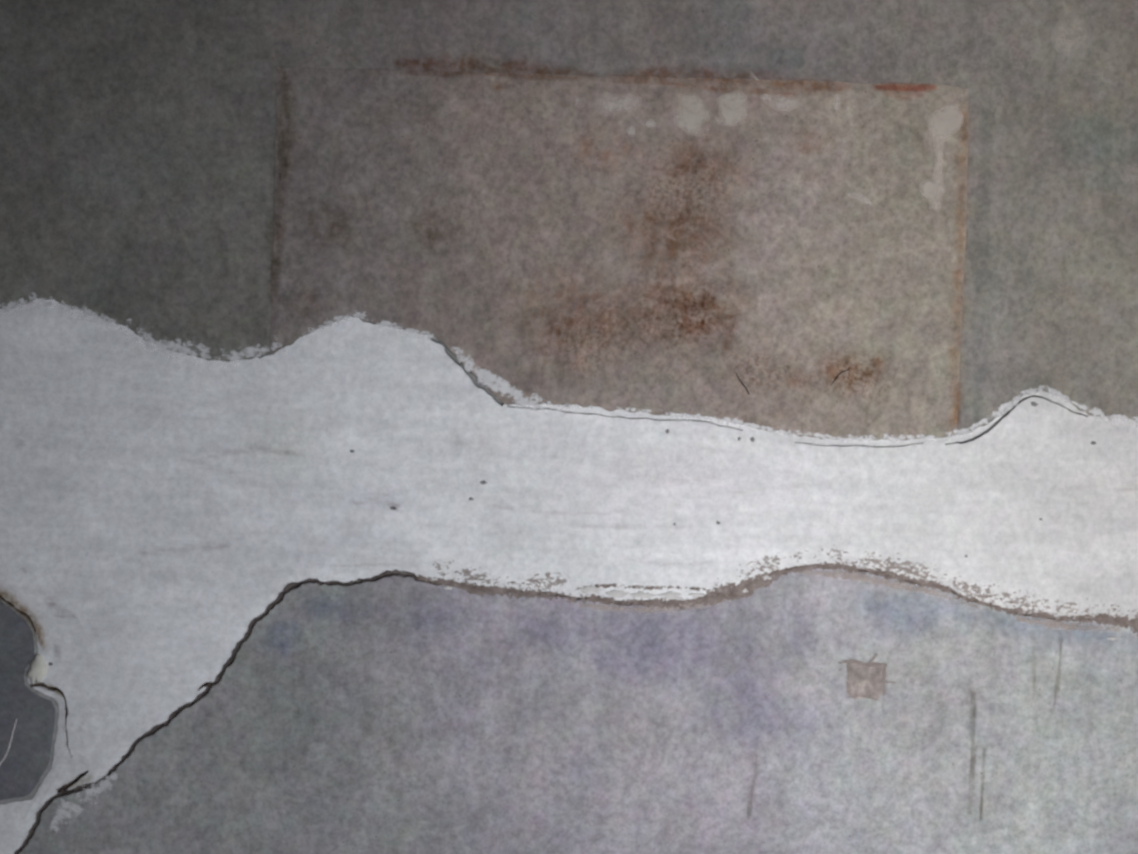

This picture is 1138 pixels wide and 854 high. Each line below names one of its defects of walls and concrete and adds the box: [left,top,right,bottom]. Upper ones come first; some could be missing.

crack [429,336,742,431]
crack [795,441,919,449]
crack [948,395,1087,445]
spalling [417,549,1138,640]
spalling [0,601,55,800]